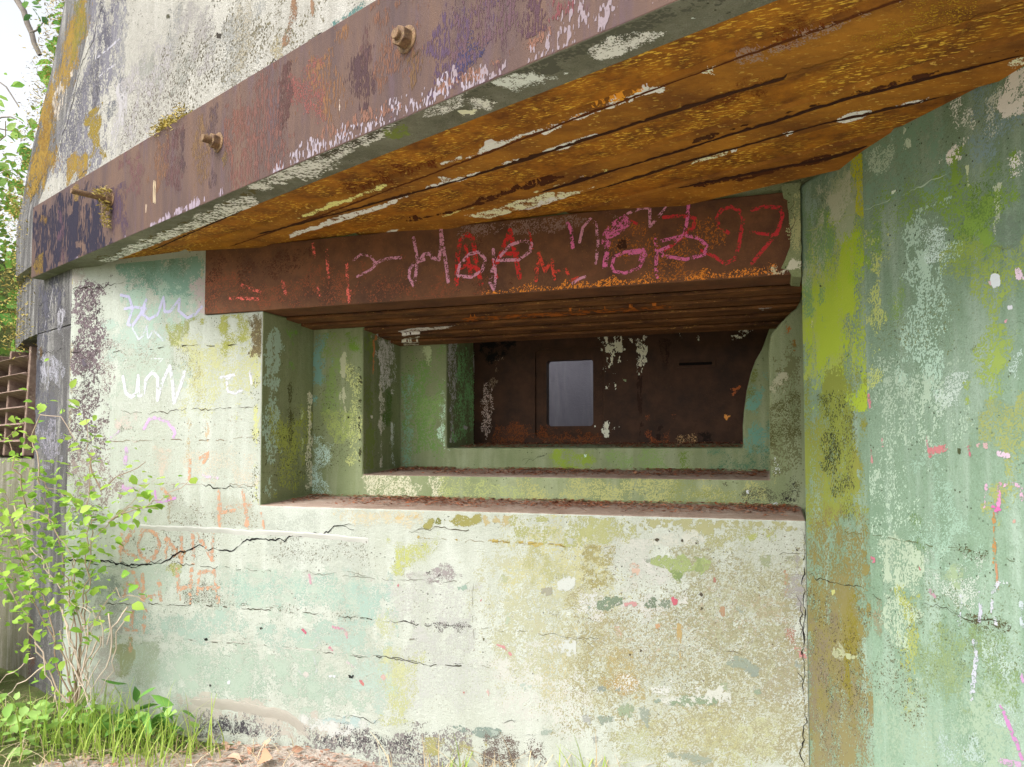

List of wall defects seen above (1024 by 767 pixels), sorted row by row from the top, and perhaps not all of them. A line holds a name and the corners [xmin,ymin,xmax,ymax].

rust [270,0,514,140]
rust [520,0,590,51]
rust [591,88,644,108]
rust [32,103,228,273]
leakage [34,0,726,469]
rust [339,157,445,196]
rust [406,175,564,222]
rust [205,211,777,313]
peeling [599,335,648,375]
crack [66,524,351,573]
leakage [175,562,715,767]
crack [745,533,1006,765]